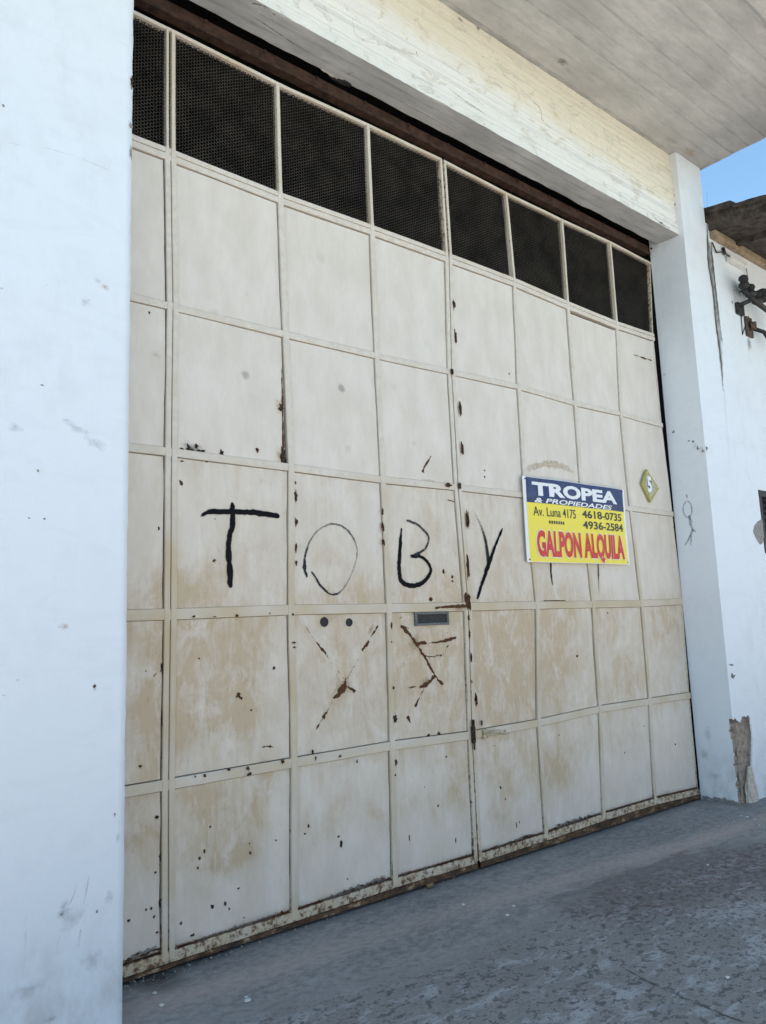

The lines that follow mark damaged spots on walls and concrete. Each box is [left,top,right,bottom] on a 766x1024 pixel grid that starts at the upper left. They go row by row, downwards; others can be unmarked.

rust [278,370,286,463]
rust [362,592,471,723]
rust [316,667,356,729]
flaking render [731,717,759,805]
rust [487,821,534,851]
rust [553,815,592,829]
rust [317,876,385,903]
rust [190,911,283,943]
rust [123,931,161,962]